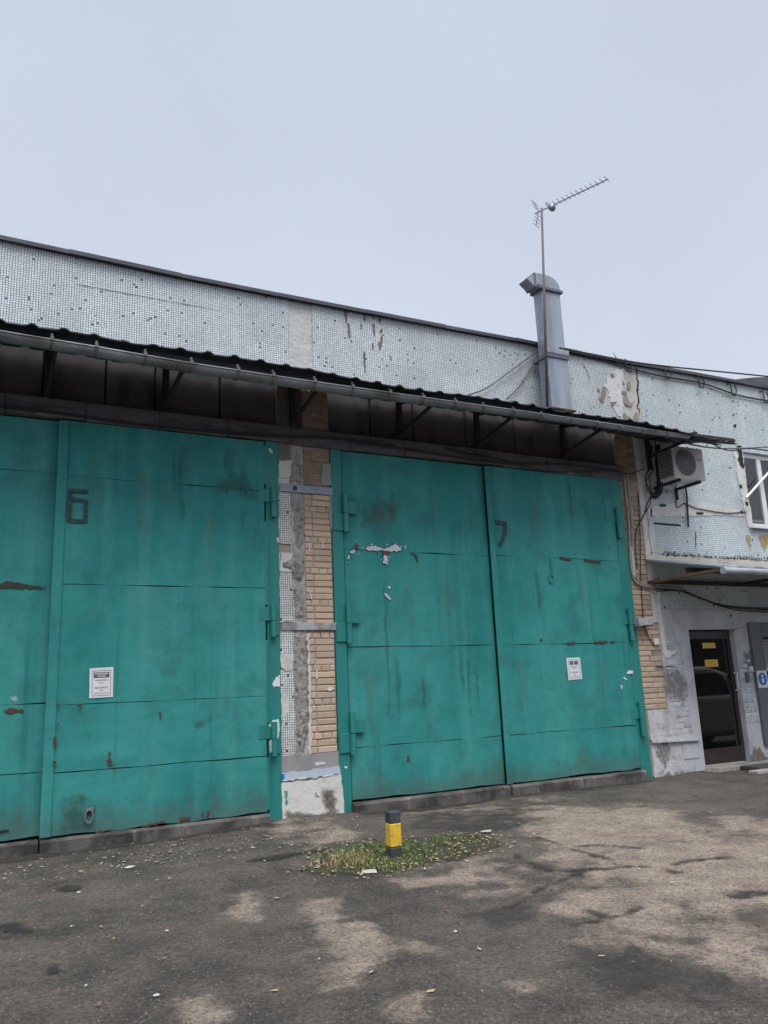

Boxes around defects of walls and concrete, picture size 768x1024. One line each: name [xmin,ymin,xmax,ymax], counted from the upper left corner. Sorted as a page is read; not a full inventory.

corrosion [344,310,392,372]
peeling [598,352,638,422]
corrosion [0,581,46,589]
spalling [283,499,305,618]
peeling [347,541,418,564]
spalling [293,634,309,755]